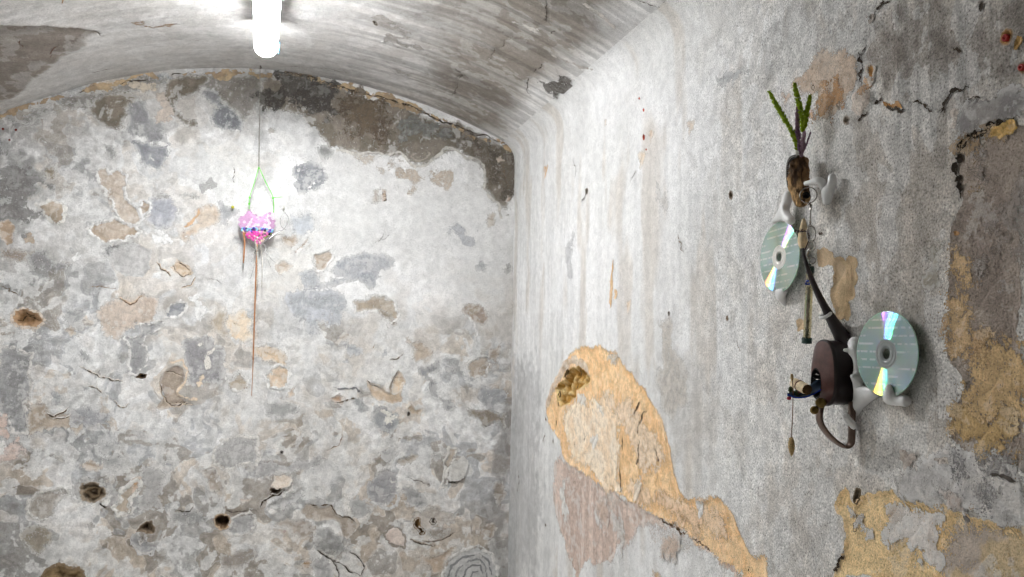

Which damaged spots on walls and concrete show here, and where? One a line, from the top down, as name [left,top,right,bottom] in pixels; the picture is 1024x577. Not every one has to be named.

peeling [791,39,876,128]
crack [857,47,980,121]
water stain [59,69,515,219]
spalling [817,247,860,322]
peeling [923,116,1024,492]
crack [80,366,129,408]
peeling [157,359,198,410]
spalling [330,371,423,417]
peeling [546,337,768,577]
peeling [24,459,156,535]
crack [317,549,366,577]
peeling [834,487,1024,577]